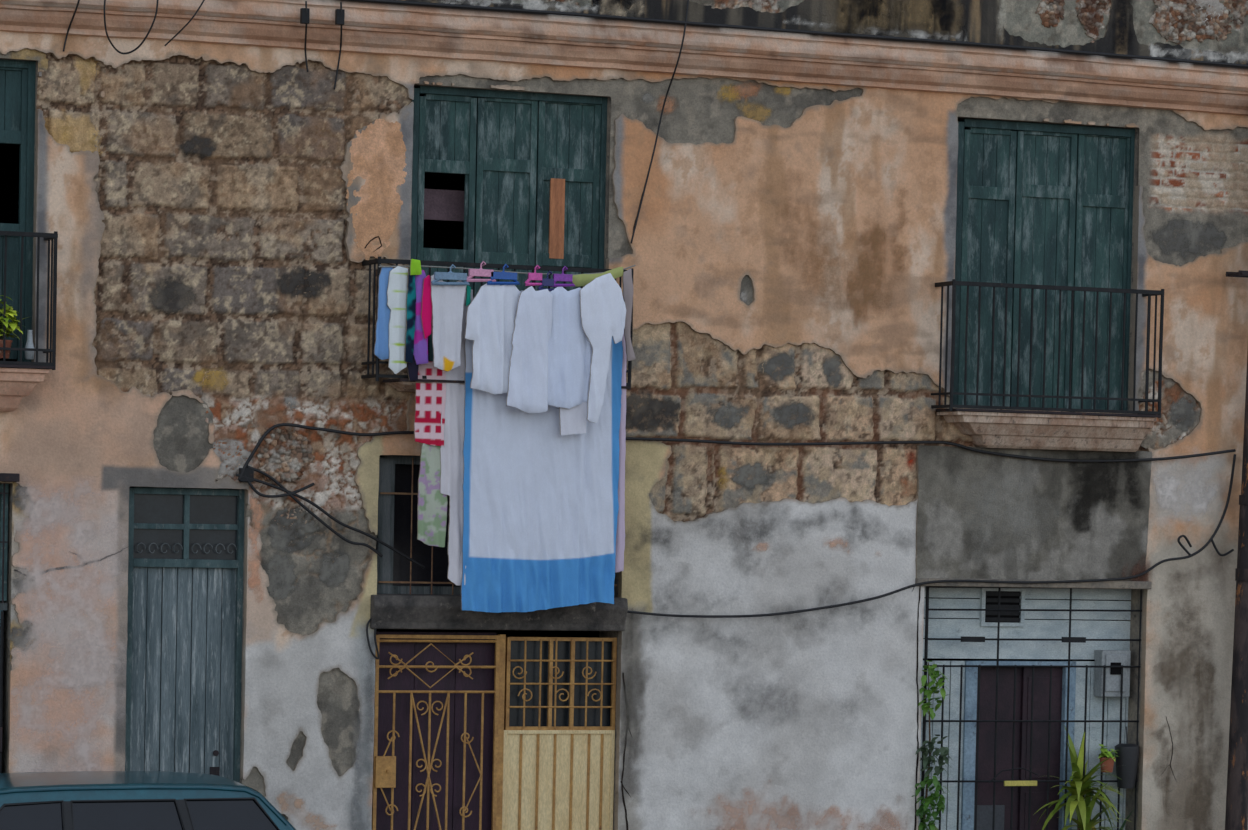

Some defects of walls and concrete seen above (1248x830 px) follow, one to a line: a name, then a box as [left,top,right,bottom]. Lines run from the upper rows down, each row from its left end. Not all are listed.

water stain [443,0,644,15]
spalling [689,0,803,13]
water stain [840,0,960,39]
spalling [999,0,1111,48]
water stain [1150,45,1178,57]
spalling [1131,0,1248,57]
water stain [1194,51,1248,63]
spalling [956,97,1248,266]
spalling [0,48,862,635]
spalling [625,322,976,522]
spalling [0,481,37,671]